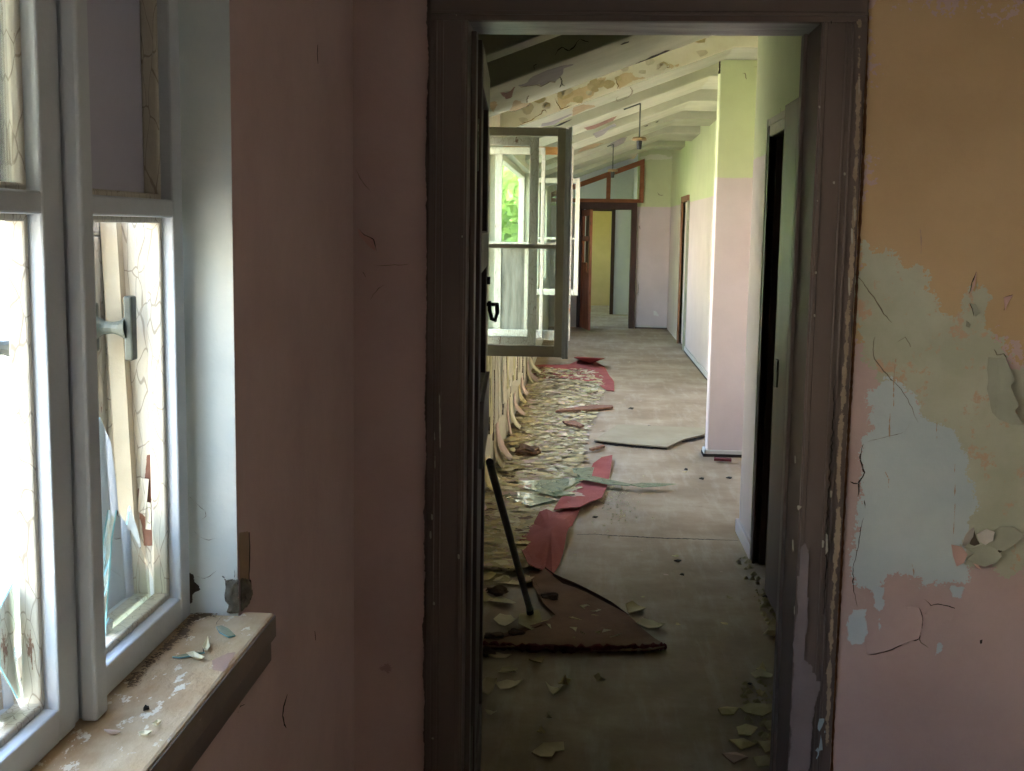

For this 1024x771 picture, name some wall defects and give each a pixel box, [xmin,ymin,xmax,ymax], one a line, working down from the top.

peeling [483,49,679,127]
spalling [577,116,627,153]
peeling [788,19,1024,771]
crack [824,274,917,609]
spalling [222,571,253,614]
peeling [186,636,236,671]